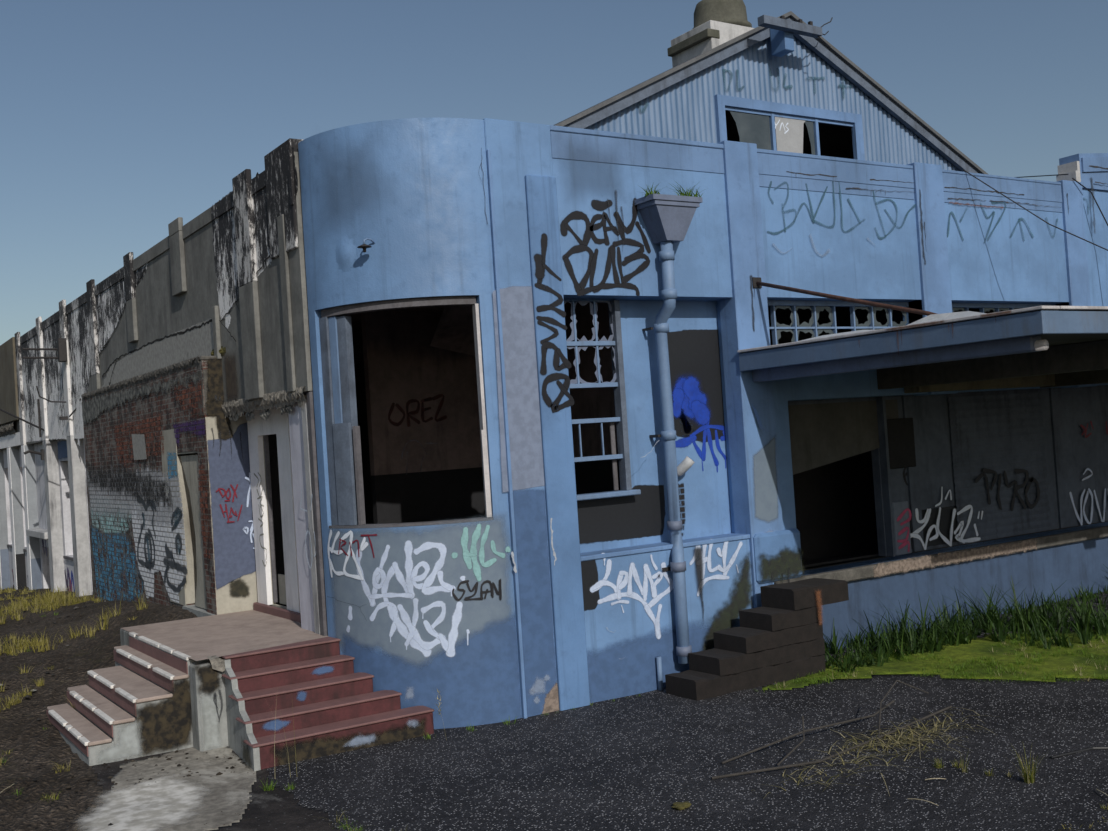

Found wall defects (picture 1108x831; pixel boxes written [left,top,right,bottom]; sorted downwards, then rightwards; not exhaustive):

peeling [252,187,272,277]
flaking render [0,191,239,446]
spalling [222,386,306,421]
flaking render [197,465,212,559]